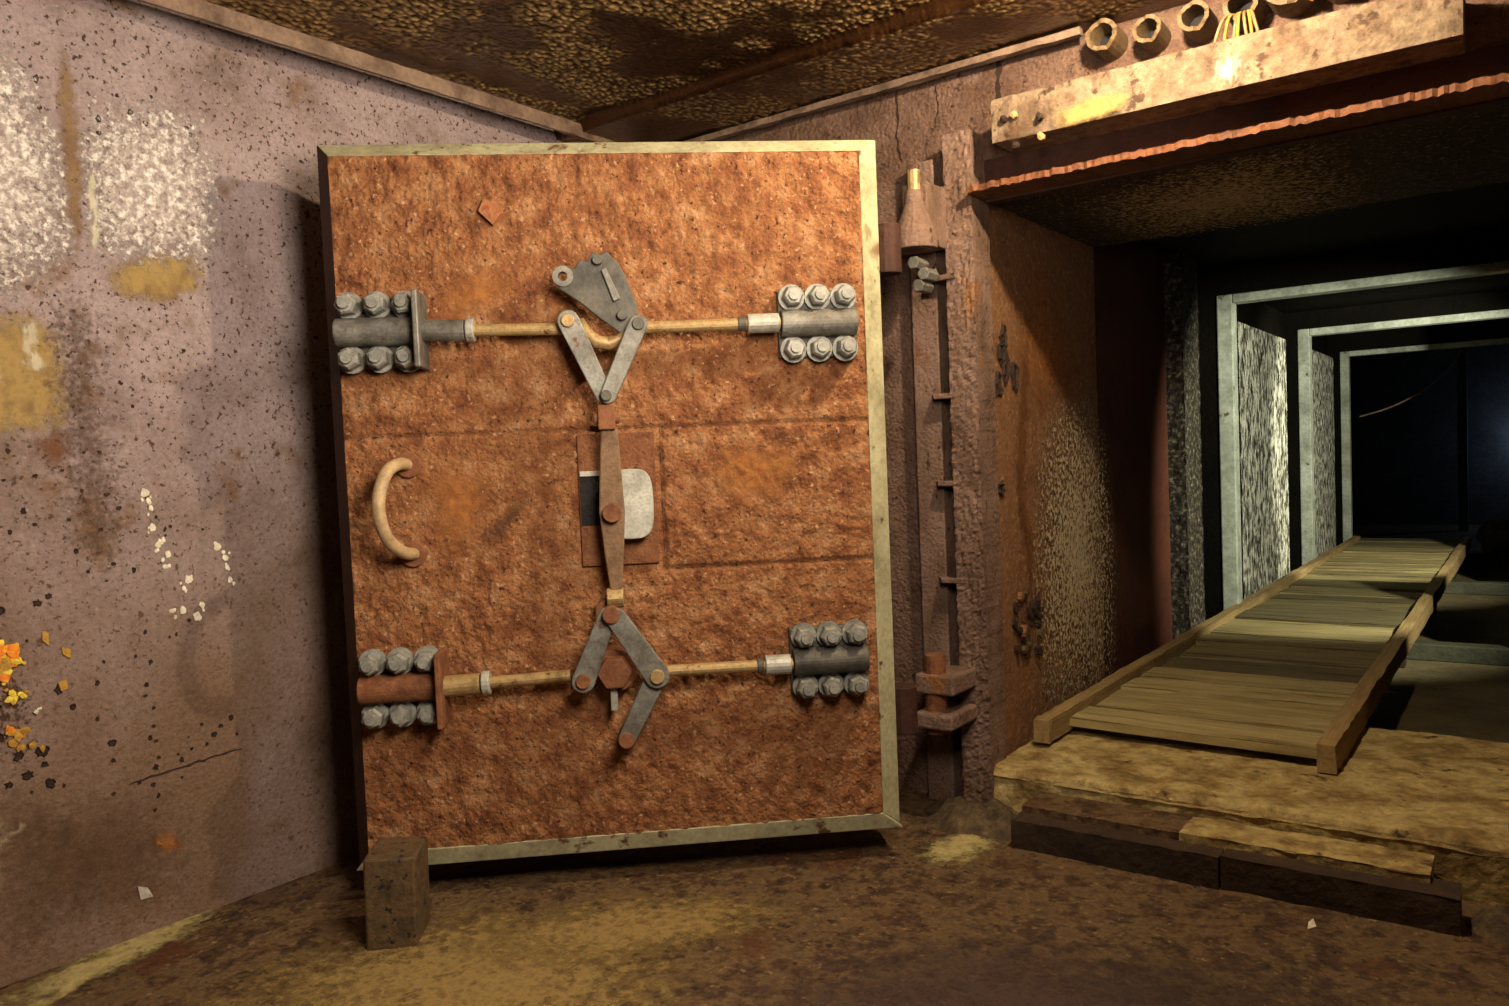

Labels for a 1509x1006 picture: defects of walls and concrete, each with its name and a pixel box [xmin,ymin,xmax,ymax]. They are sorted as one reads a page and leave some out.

peeling [0,39,221,315]
corrosion [478,198,502,226]
peeling [0,631,71,794]
peeling [54,679,76,710]